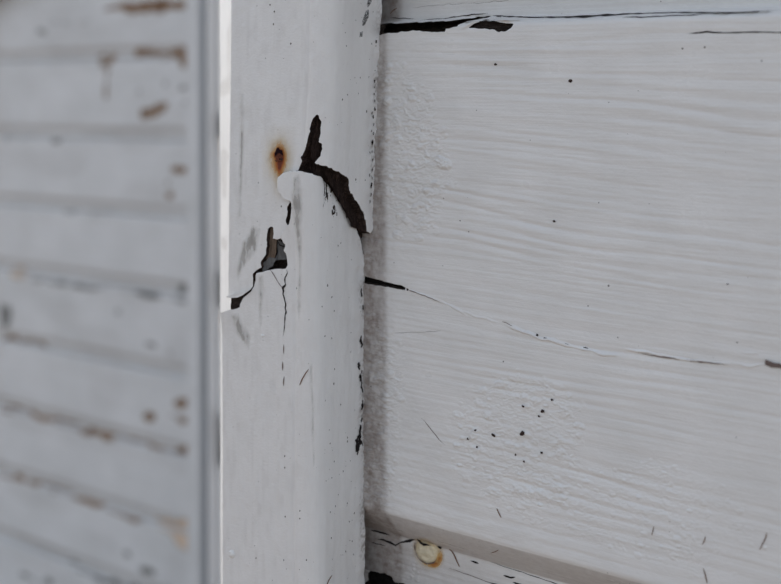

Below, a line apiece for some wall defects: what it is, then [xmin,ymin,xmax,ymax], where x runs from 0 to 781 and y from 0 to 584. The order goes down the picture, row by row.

peeling [105,0,186,14]
crack [392,0,781,34]
peeling [135,46,186,67]
rust [270,143,287,176]
crack [365,276,781,368]
crack [371,530,556,584]